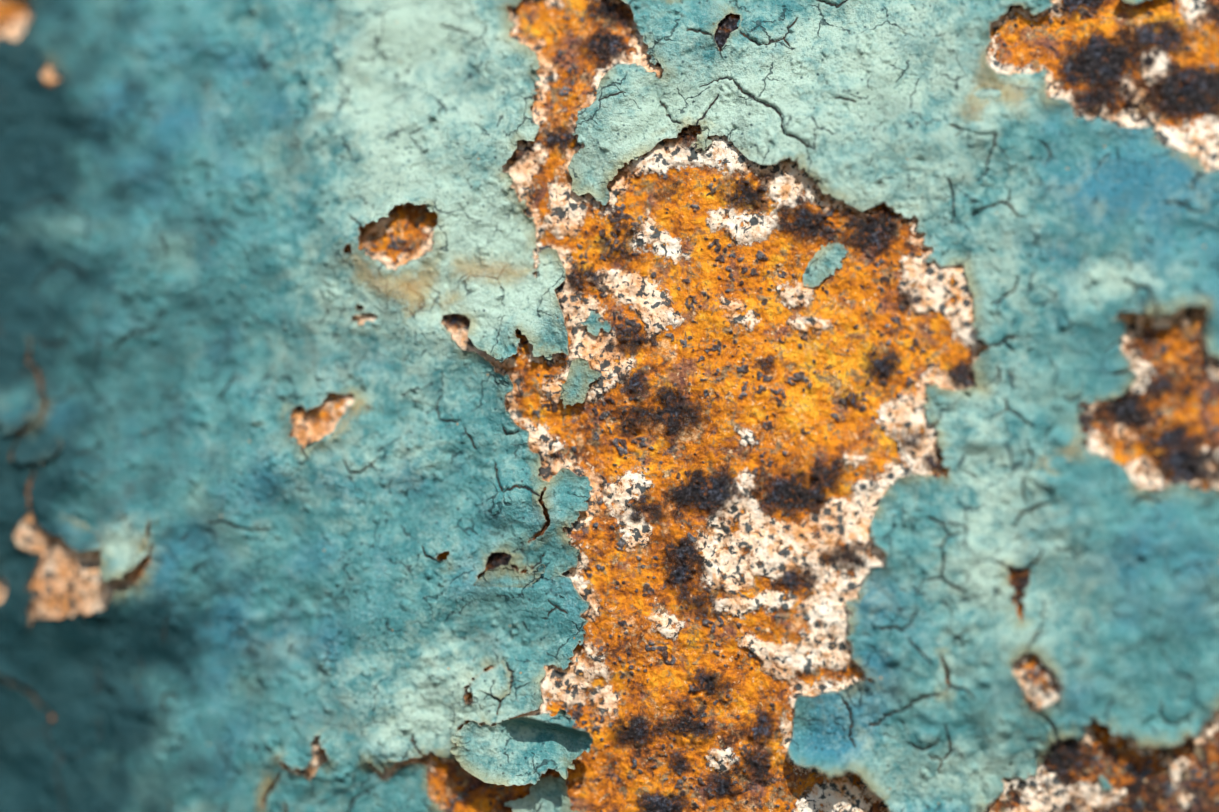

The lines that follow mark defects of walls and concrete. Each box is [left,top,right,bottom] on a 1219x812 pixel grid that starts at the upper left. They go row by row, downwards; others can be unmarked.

peeling [986,0,1219,172]
corrosion [1053,0,1219,121]
crack [426,395,550,570]
peeling [369,0,989,812]
corrosion [620,462,836,523]
crack [986,277,1056,527]
corrosion [1094,371,1219,489]
peeling [14,511,152,627]
crack [491,663,513,715]
crack [842,517,974,747]
corrosion [636,790,689,812]
peeling [984,709,1219,812]